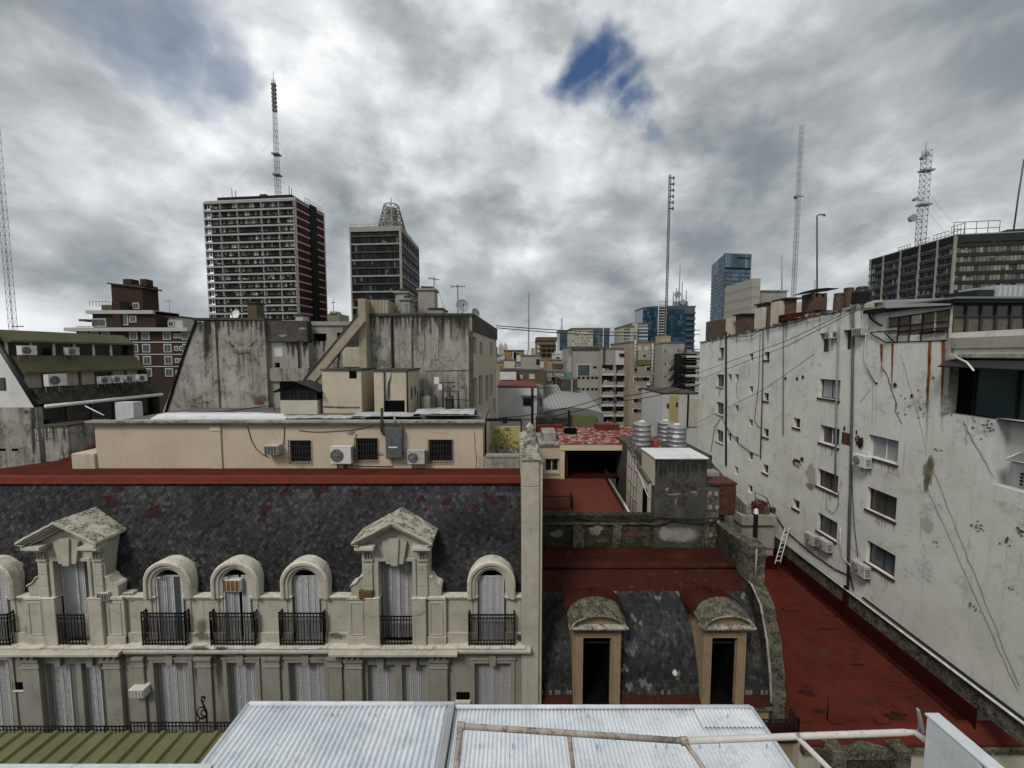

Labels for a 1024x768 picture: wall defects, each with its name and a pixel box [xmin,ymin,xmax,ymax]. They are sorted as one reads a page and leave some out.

leakage [196,320,266,356]
leakage [370,316,469,335]
corrosion [926,341,945,405]
crack [861,355,1020,691]